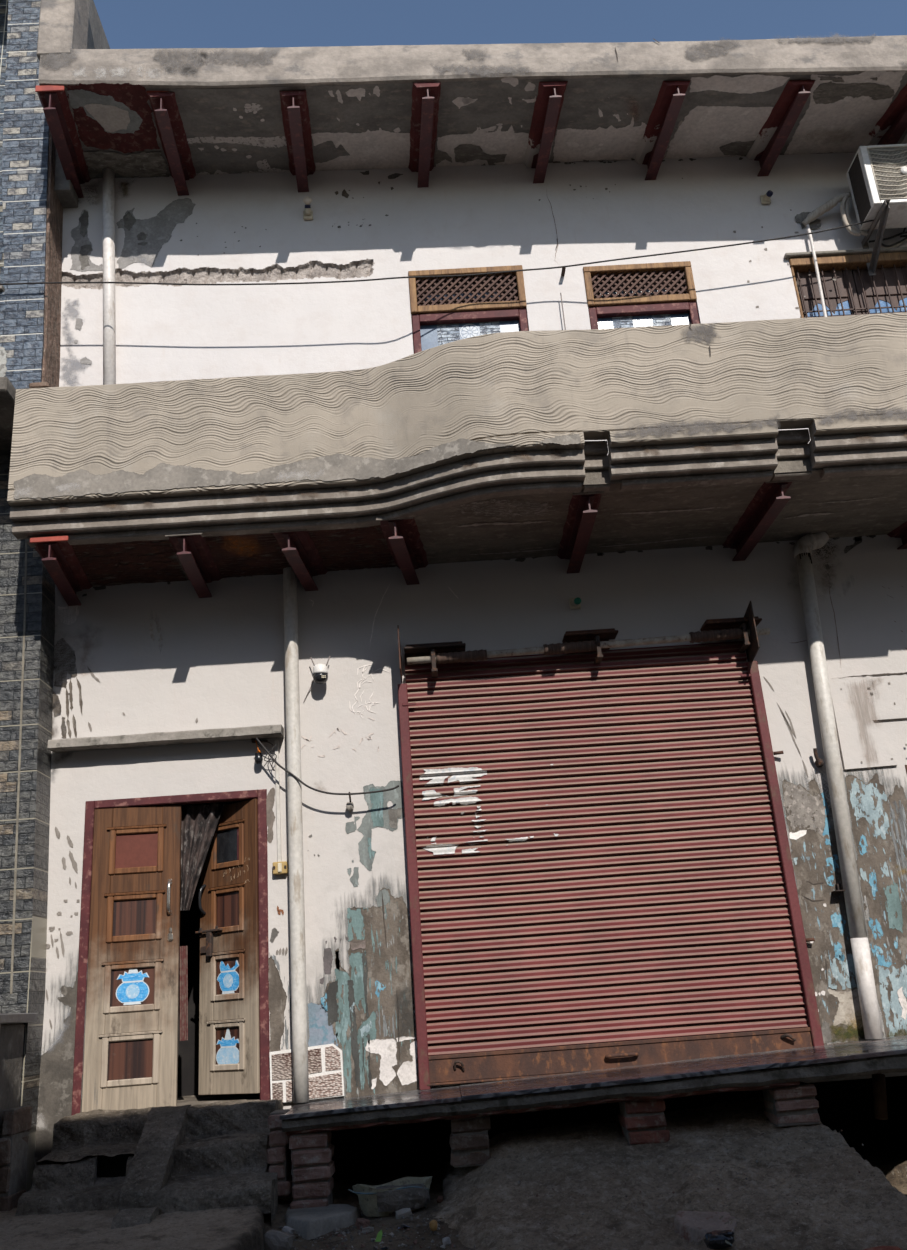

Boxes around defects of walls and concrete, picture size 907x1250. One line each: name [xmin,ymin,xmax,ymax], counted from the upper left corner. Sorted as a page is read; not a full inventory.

peeling [65,83,160,154]
peeling [434,123,529,167]
peeling [553,97,647,164]
peeling [662,74,790,162]
peeling [784,70,905,155]
flaking render [62,198,375,290]
peeling [52,638,100,738]
peeling [266,787,275,843]
peeling [307,780,420,1098]
peeling [779,773,867,1044]
peeling [843,758,907,1038]
peeling [268,928,292,1052]